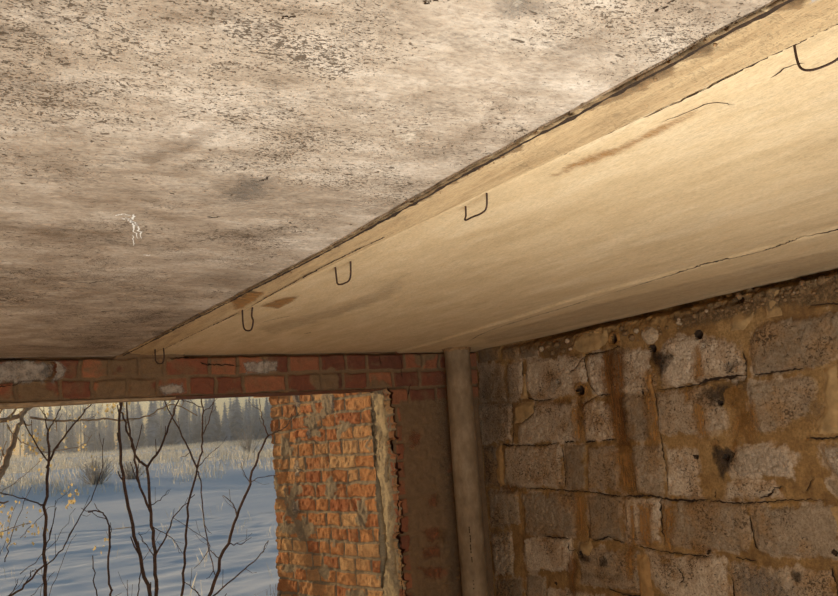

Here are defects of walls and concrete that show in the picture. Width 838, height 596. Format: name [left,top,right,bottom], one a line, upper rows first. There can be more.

crack [609,24,838,134]
crack [123,0,794,366]
water stain [567,126,667,171]
peeling [52,360,66,382]
crack [502,346,824,583]